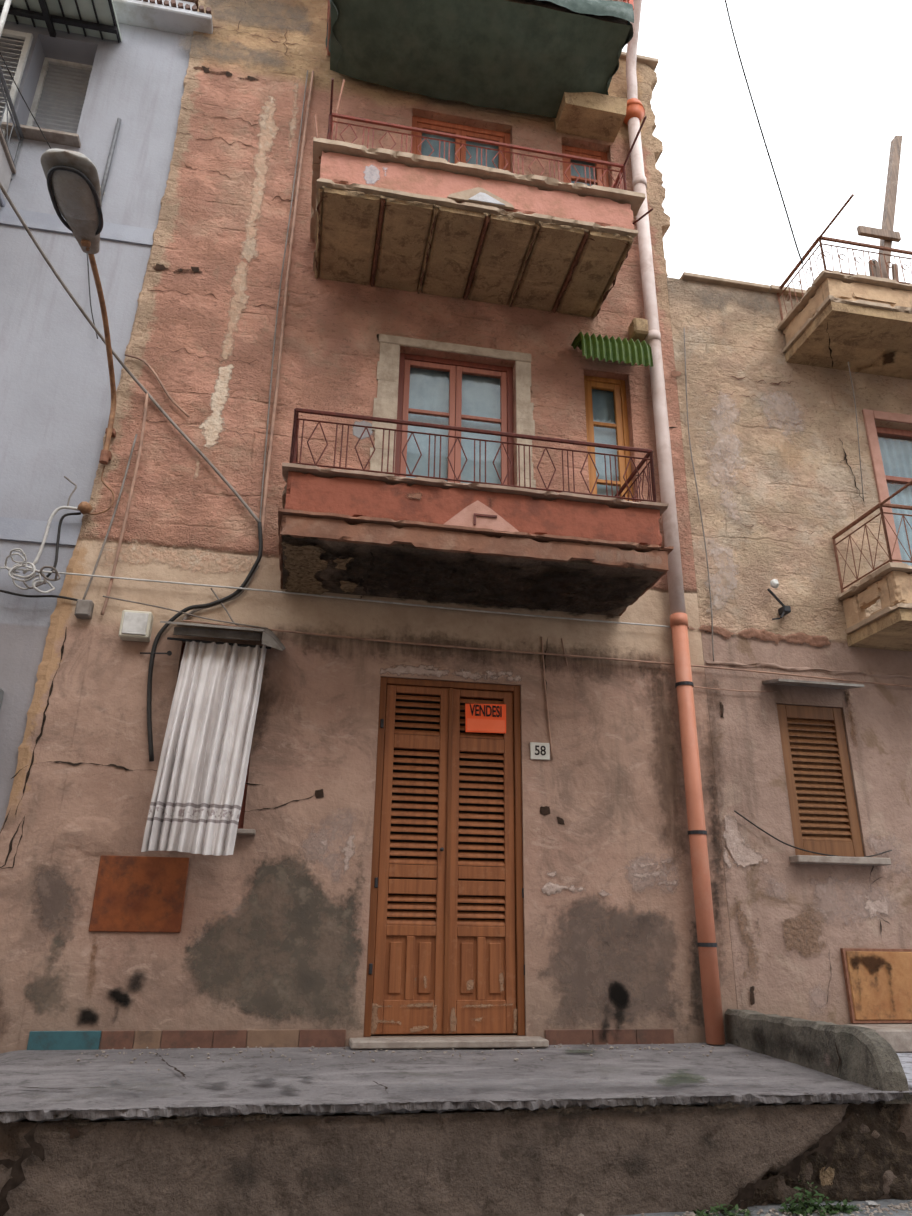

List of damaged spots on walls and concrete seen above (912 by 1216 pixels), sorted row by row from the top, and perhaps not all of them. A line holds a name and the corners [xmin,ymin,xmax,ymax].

peeling [322,165,441,208]
flaking render [199,84,299,447]
crack [840,440,865,504]
crack [0,627,156,869]
crack [244,783,314,812]
flaking render [723,815,768,867]
damp [25,867,78,1013]
damp [184,856,362,1028]
damp [540,897,676,1040]
crack [0,1121,45,1216]
spalling [500,1102,758,1116]
spalling [739,1087,912,1208]